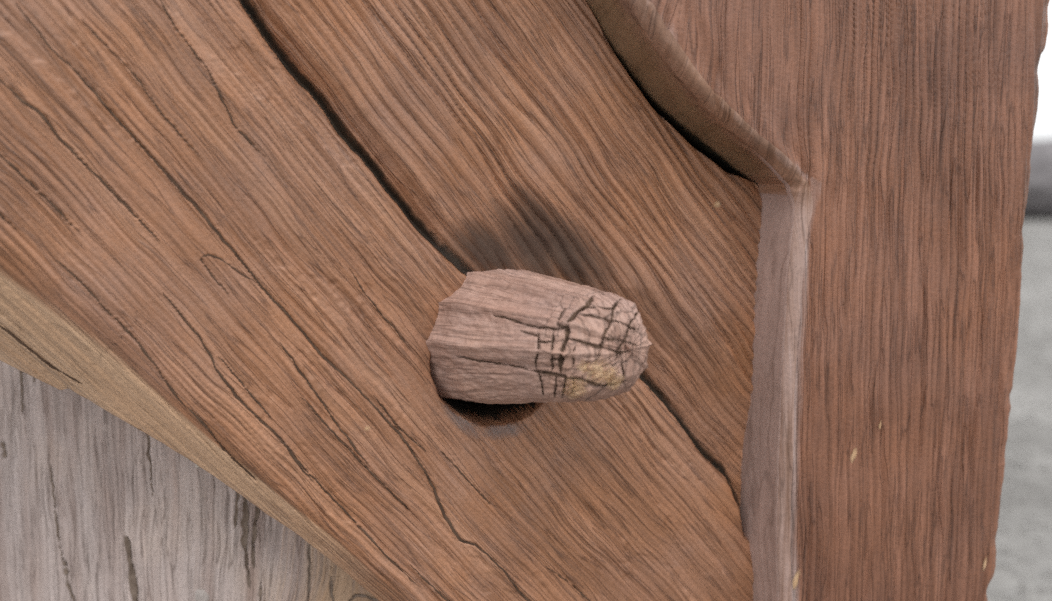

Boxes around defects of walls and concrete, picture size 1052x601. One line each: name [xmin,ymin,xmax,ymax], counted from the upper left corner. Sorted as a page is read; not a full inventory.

crack [0,0,530,601]
crack [457,297,641,398]
crack [547,567,590,601]